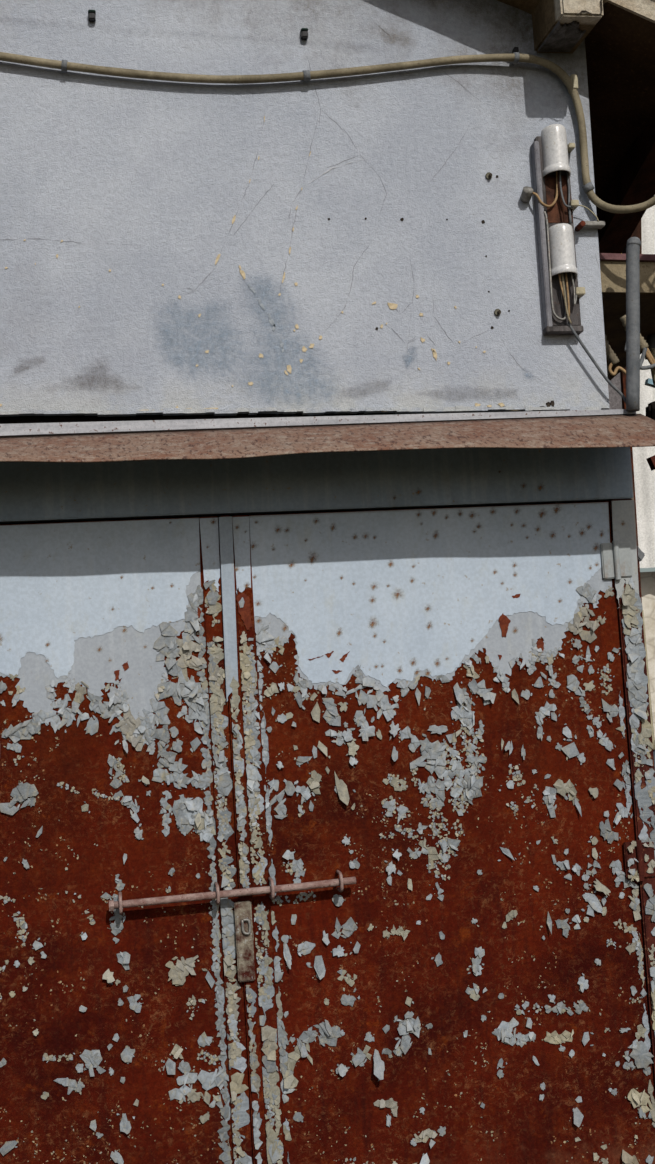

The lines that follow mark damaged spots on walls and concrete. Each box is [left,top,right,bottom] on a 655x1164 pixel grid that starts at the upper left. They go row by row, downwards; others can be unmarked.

crack [184,45,400,344]
crack [388,266,543,390]
corrosion [511,507,603,569]
corrosion [236,576,261,630]
corrosion [498,613,516,637]
peeling [0,577,655,1164]